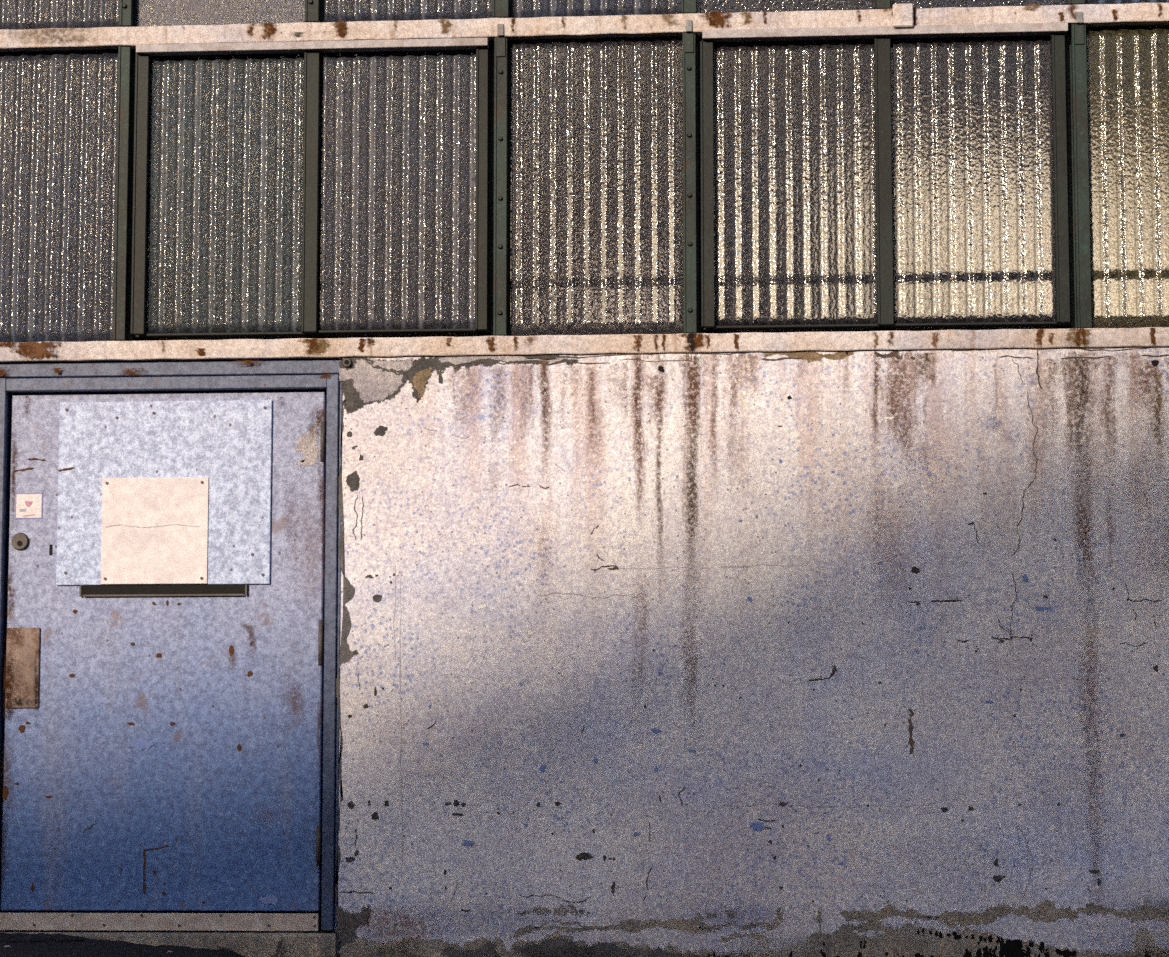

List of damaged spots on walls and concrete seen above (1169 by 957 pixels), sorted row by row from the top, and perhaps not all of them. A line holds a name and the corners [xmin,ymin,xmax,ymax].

corrosion [247,23,276,39]
corrosion [700,11,767,27]
corrosion [0,342,61,373]
corrosion [681,333,716,368]
peeling [763,351,854,363]
spalling [875,351,915,359]
corrosion [1035,328,1091,346]
corrosion [633,334,666,492]
crack [833,347,1169,646]
peeling [335,354,1169,957]
water stain [857,939,940,957]
water stain [917,928,1050,957]